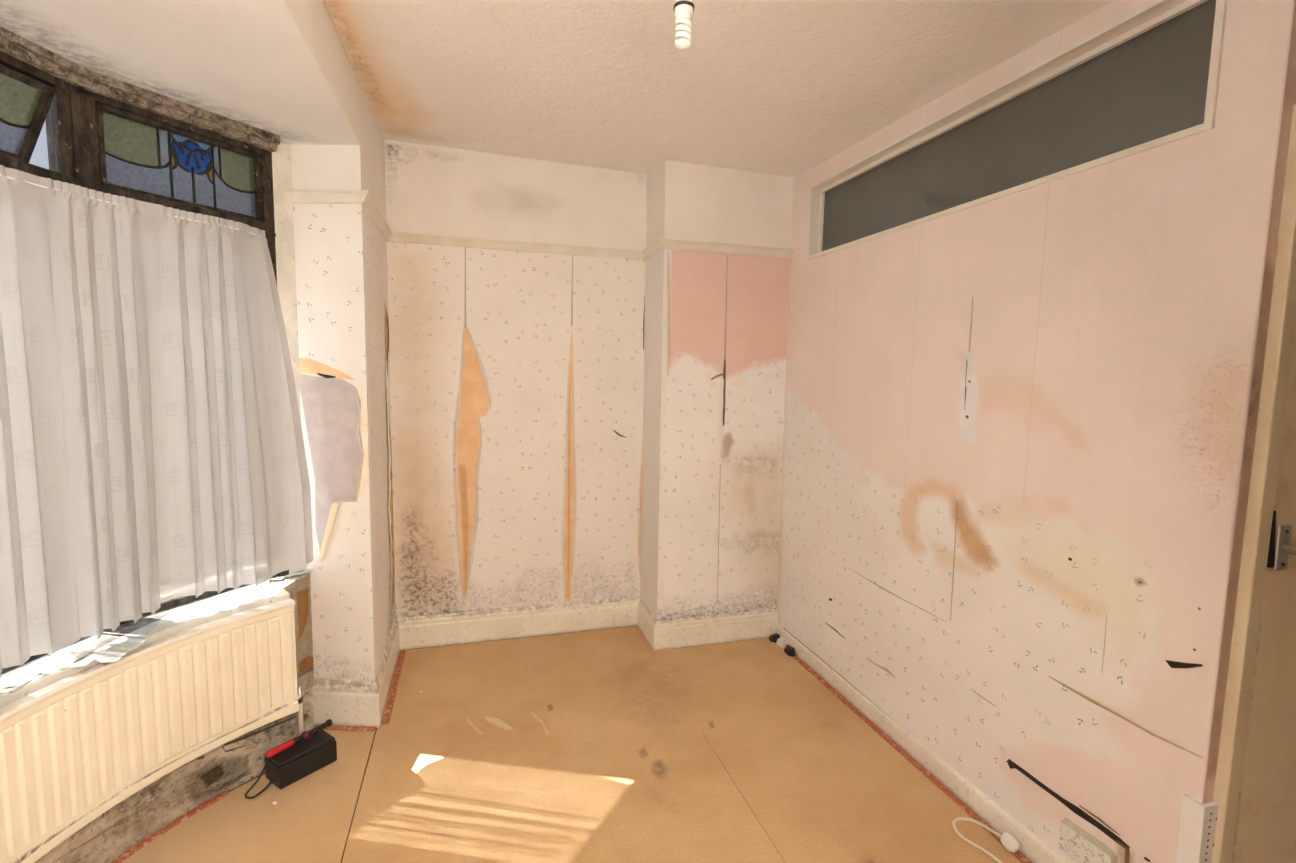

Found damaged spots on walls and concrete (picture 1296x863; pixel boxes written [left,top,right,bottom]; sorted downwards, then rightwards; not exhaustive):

water stain [0,0,640,863]
water stain [595,649,719,825]
water stain [657,410,785,621]
peeling [658,340,1194,863]
water stain [890,239,1278,798]